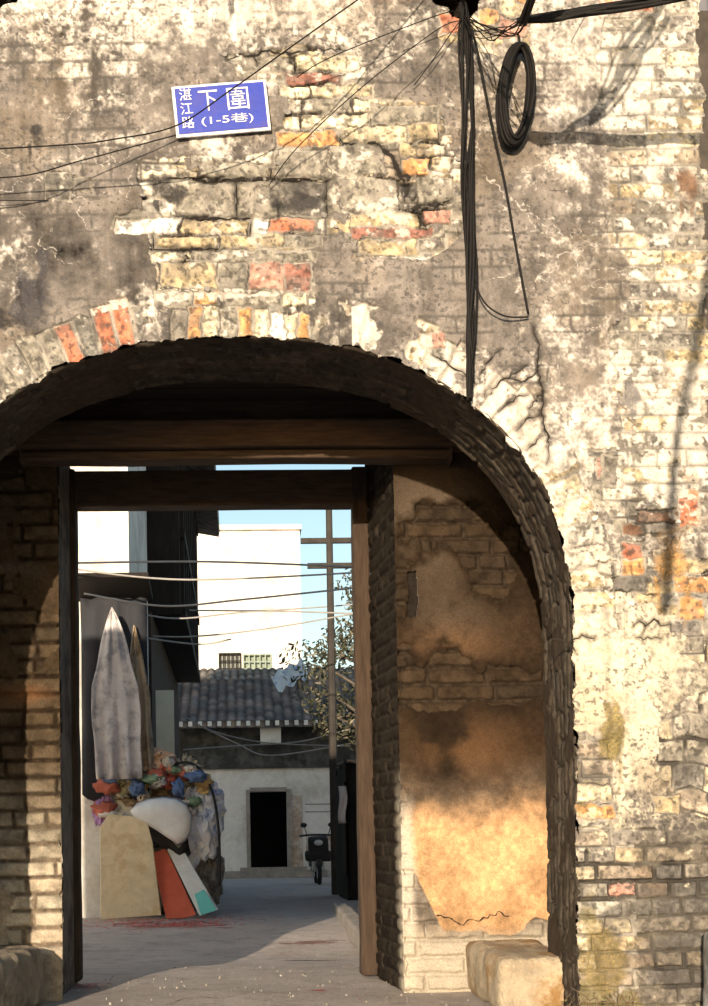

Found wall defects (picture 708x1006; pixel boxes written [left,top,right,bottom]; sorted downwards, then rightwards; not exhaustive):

leakage [28,125,42,156]
leakage [149,174,187,212]
spalling [110,45,467,299]
crack [433,326,550,464]
peeling [587,0,708,667]
leakage [599,700,625,760]